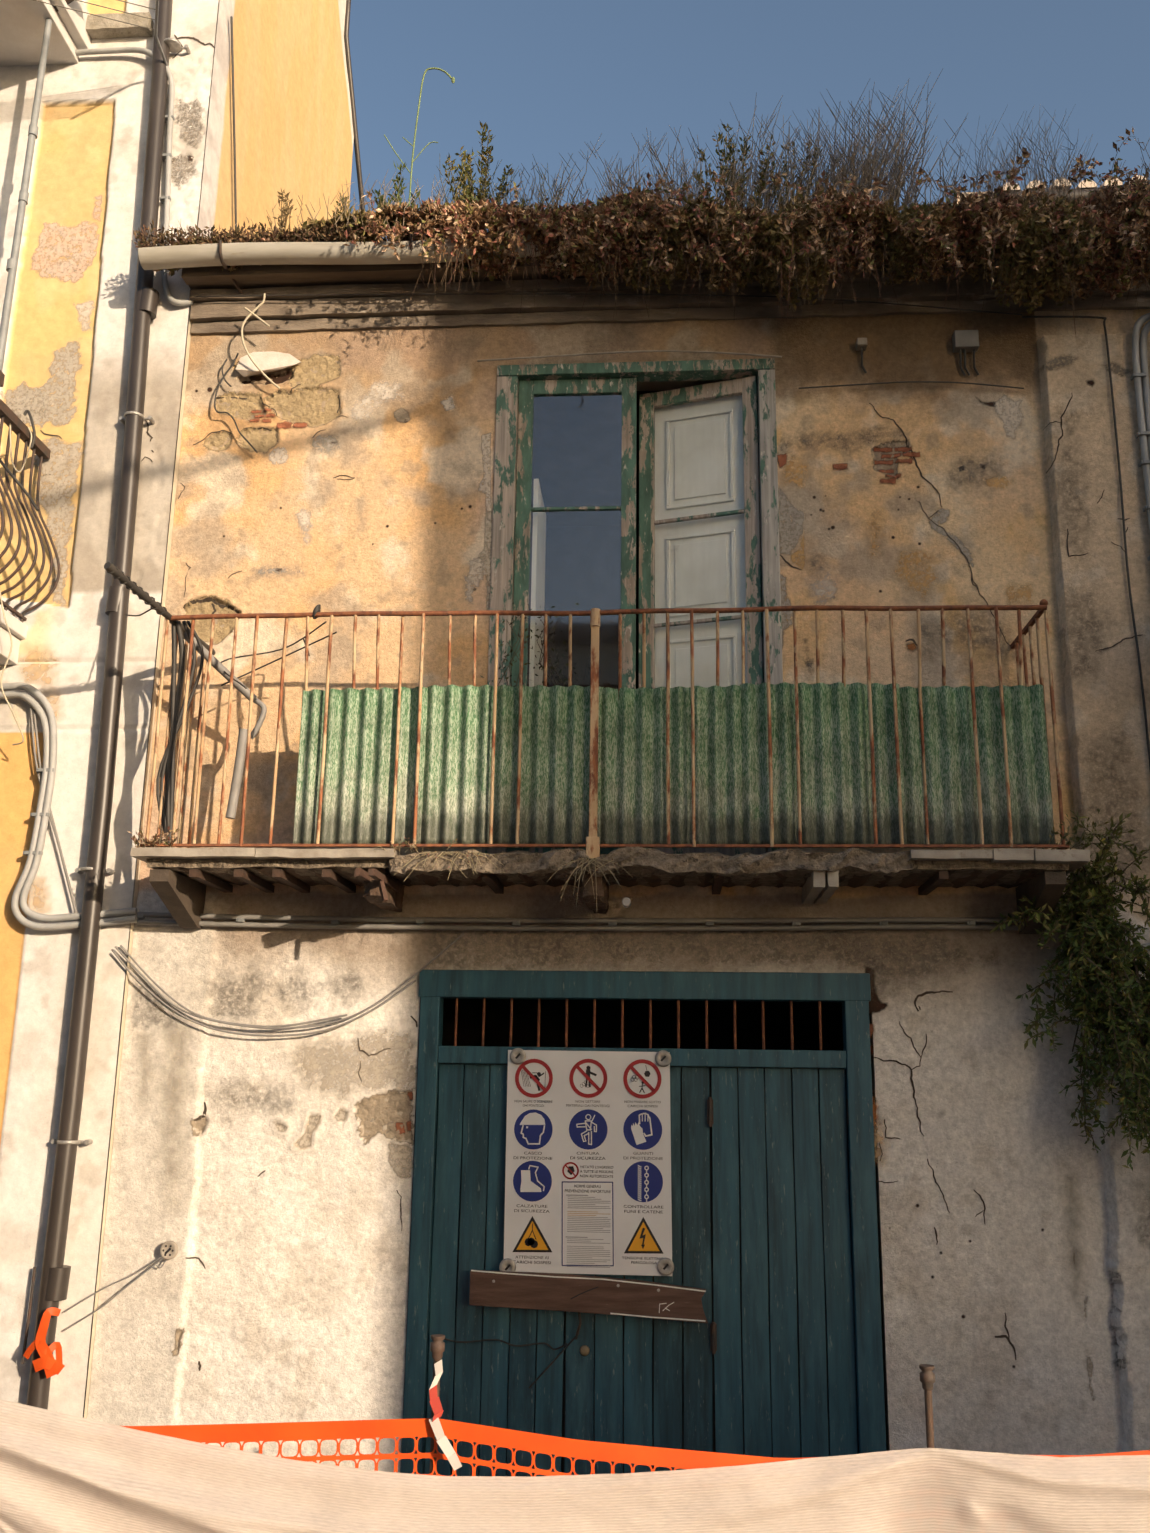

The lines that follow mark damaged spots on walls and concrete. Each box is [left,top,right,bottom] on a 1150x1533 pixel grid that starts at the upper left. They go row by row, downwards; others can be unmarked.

peeling [32,196,102,283]
peeling [0,301,93,606]
flaking render [195,351,410,453]
flaking render [777,428,920,510]
crack [869,403,1010,646]
flaking render [184,595,241,645]
peeling [296,1031,416,1178]
crack [874,990,986,1245]